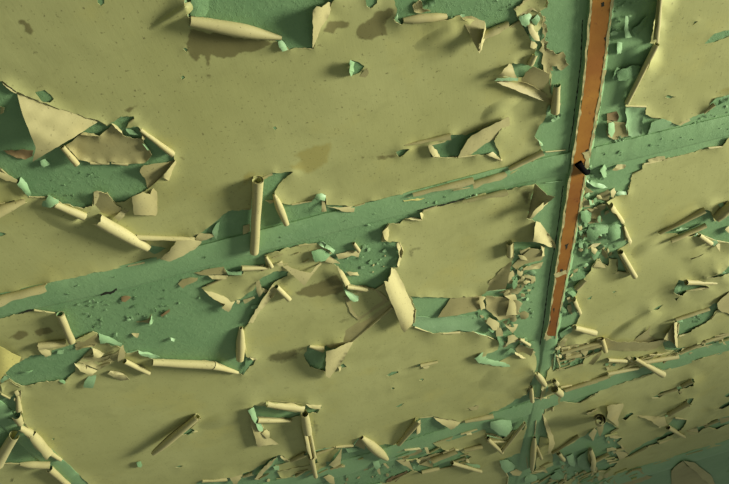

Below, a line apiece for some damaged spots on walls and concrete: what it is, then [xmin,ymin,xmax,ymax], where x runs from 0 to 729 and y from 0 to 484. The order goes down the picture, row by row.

peeling [184,0,333,52]
peeling [0,81,176,221]
peeling [394,0,729,423]
peeling [0,172,441,469]
peeling [46,466,71,484]
peeling [196,400,483,484]
peeling [484,414,530,484]
peeling [525,398,729,484]